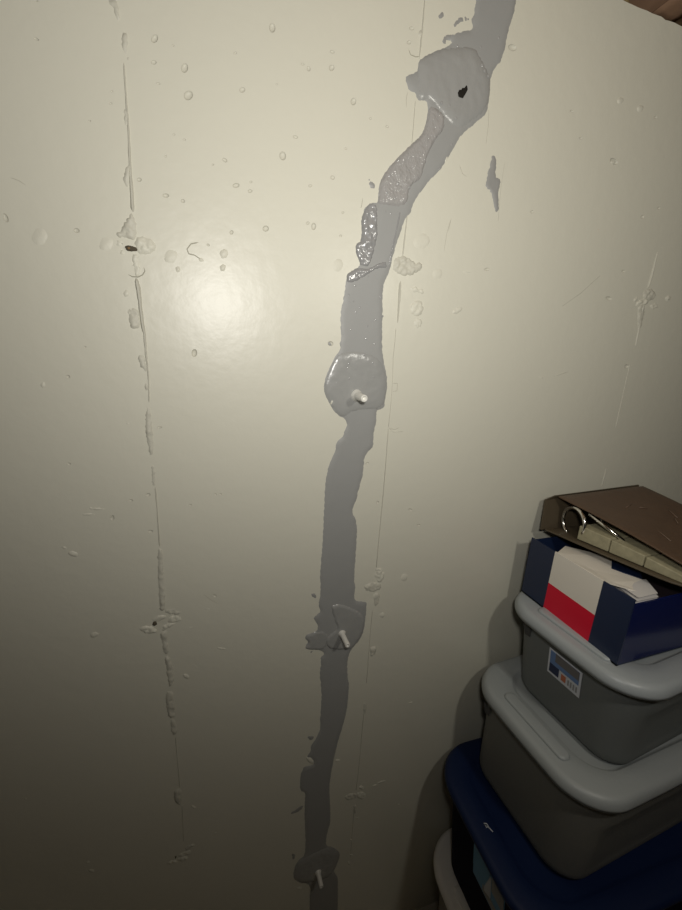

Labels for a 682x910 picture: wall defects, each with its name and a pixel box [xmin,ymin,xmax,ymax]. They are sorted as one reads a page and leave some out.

crack [123,63,134,212]
crack [128,269,150,401]
crack [293,0,516,910]